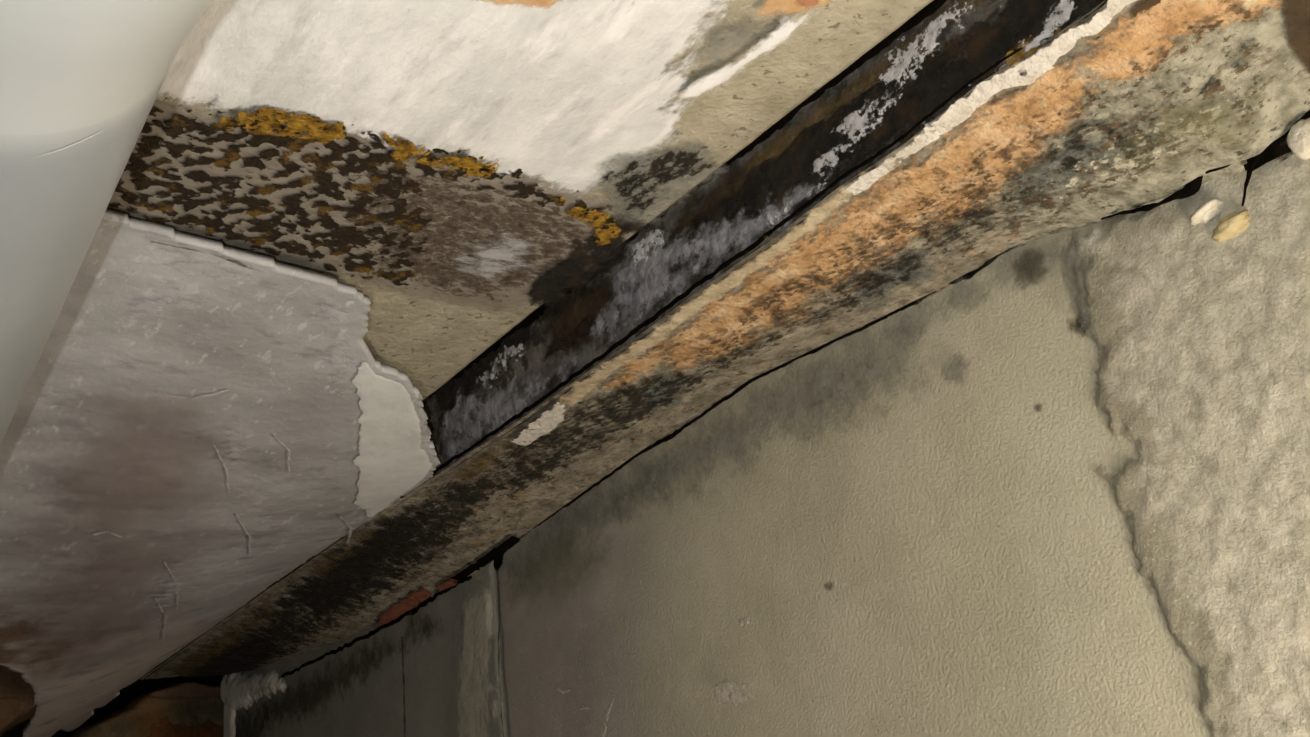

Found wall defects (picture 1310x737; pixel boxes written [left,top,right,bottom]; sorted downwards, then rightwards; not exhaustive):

damp [107,0,1107,426]
corrosion [602,0,1282,388]
crack [1101,110,1310,220]
damp [165,43,1269,737]
crack [519,244,1020,539]
crack [279,569,500,733]
spalling [376,536,521,628]